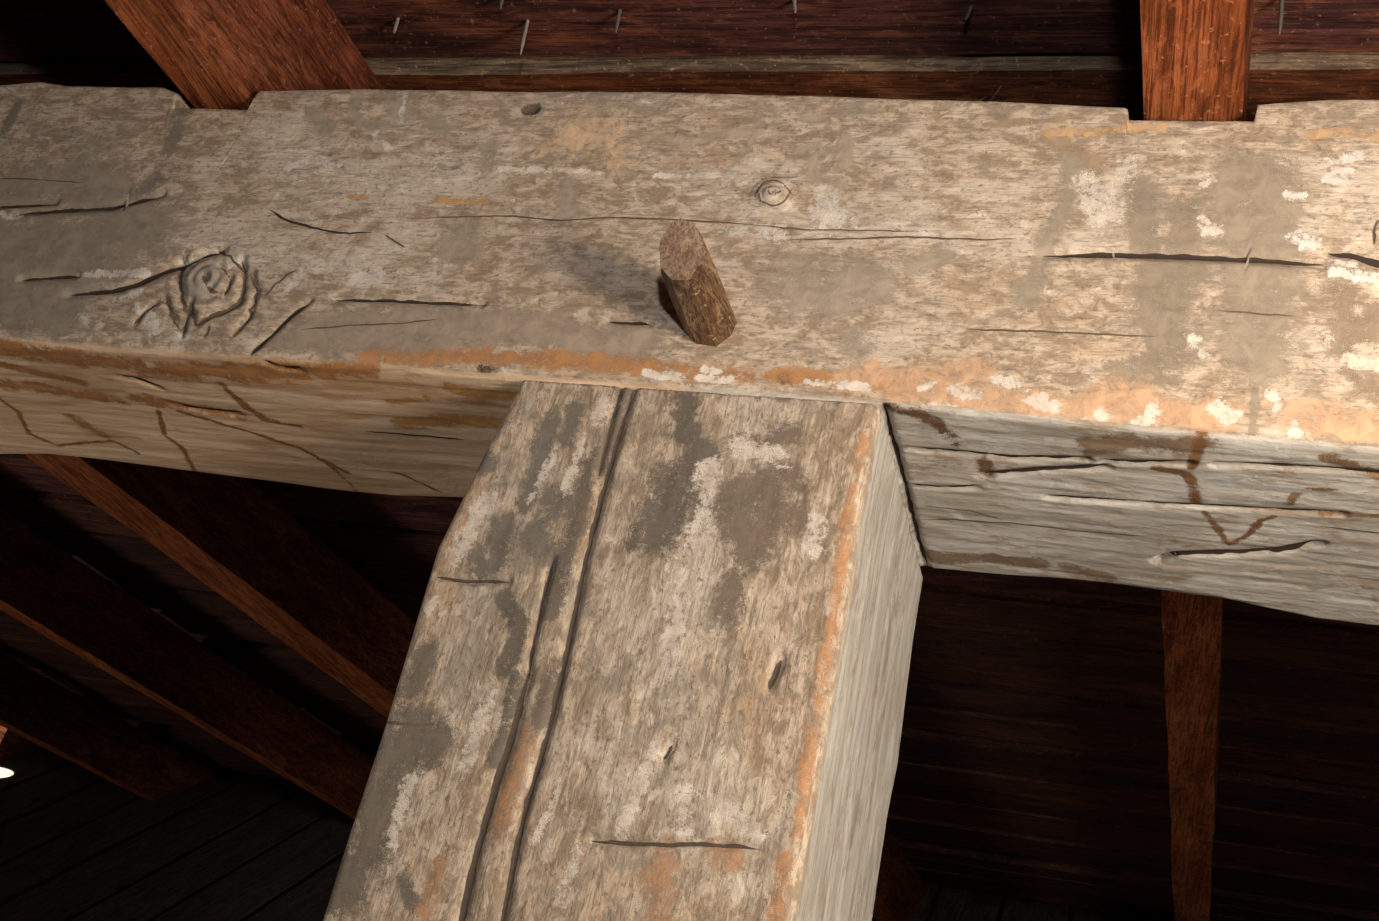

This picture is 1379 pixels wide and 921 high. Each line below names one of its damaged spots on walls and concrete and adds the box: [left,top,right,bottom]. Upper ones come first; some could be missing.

crack [0,178,164,215]
crack [22,250,225,296]
crack [1044,252,1379,268]
crack [123,375,241,412]
crack [366,431,462,440]
crack [913,447,1379,537]
crack [438,576,509,584]
crack [459,391,634,921]
crack [593,840,759,850]